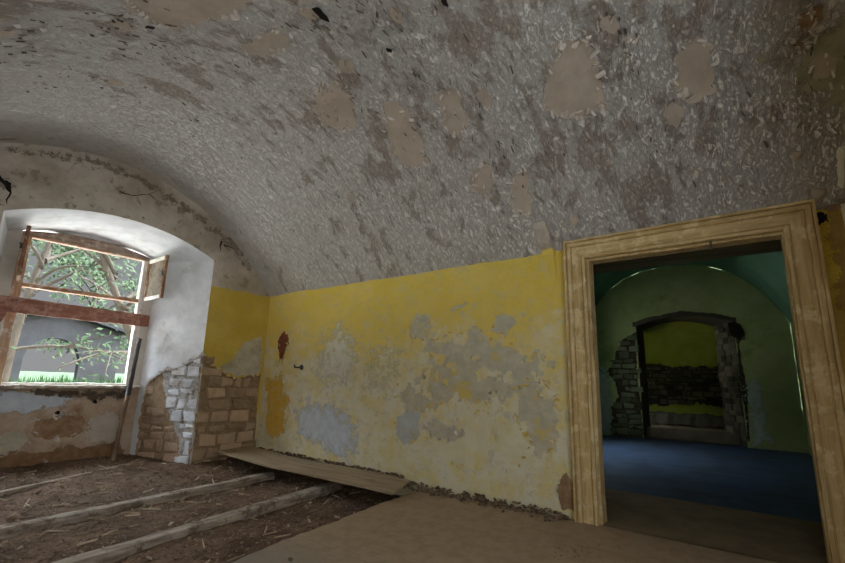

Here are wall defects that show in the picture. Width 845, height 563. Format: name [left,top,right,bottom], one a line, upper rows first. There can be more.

peeling [281,0,430,102]
spalling [537,10,654,131]
peeling [686,3,845,188]
crack [0,175,17,203]
spalling [0,411,124,458]
spalling [135,335,263,464]
peeling [394,313,562,459]
spalling [556,473,574,511]